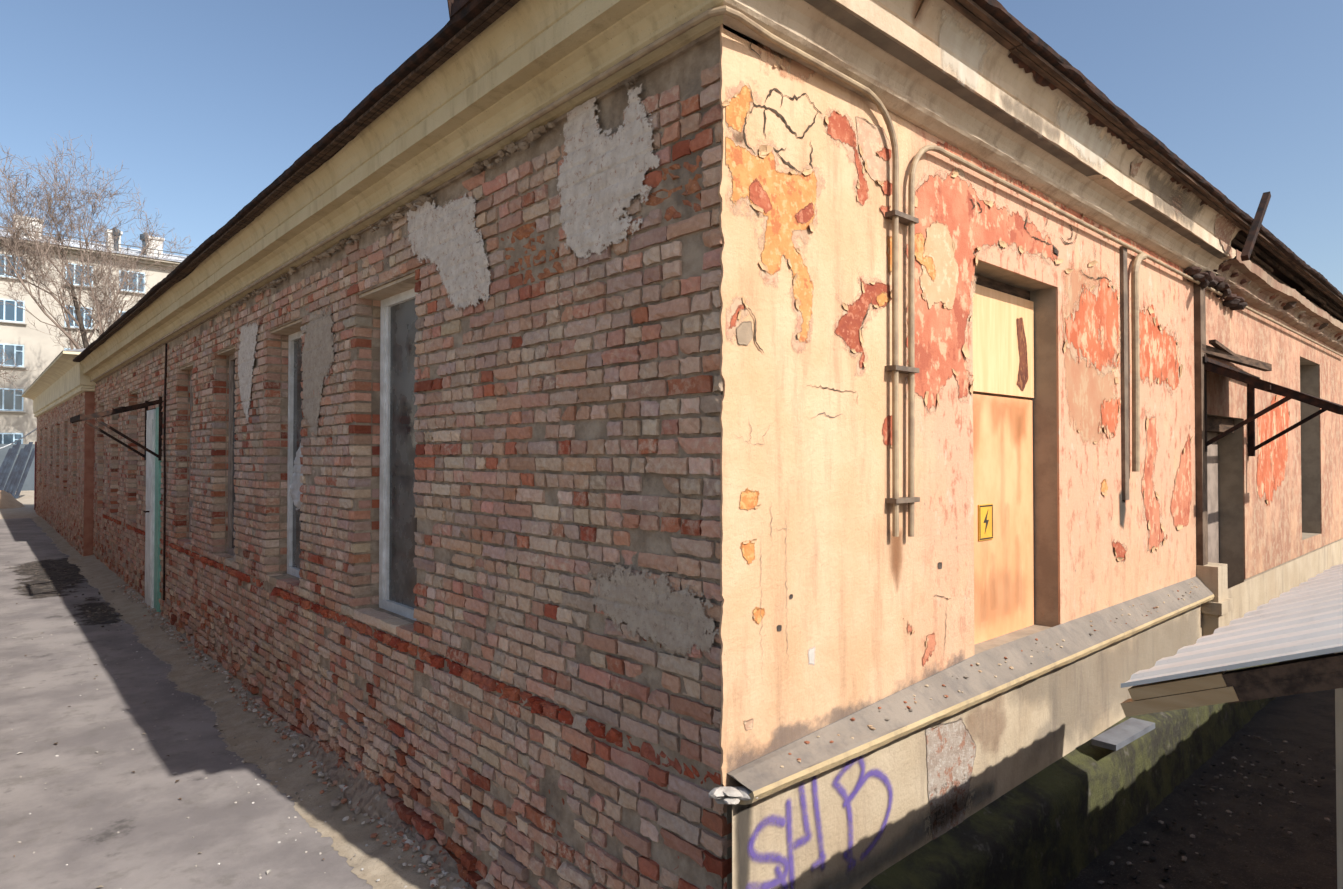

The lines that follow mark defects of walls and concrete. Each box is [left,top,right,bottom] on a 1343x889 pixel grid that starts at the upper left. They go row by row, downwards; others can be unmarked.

crack [743,40,821,172]
flaking render [643,155,702,221]
peeling [722,81,825,353]
peeling [821,109,892,220]
peeling [835,141,1186,448]
peeling [740,539,757,565]
peeling [739,487,761,510]
peeling [1142,410,1193,552]
peeling [1257,395,1290,506]